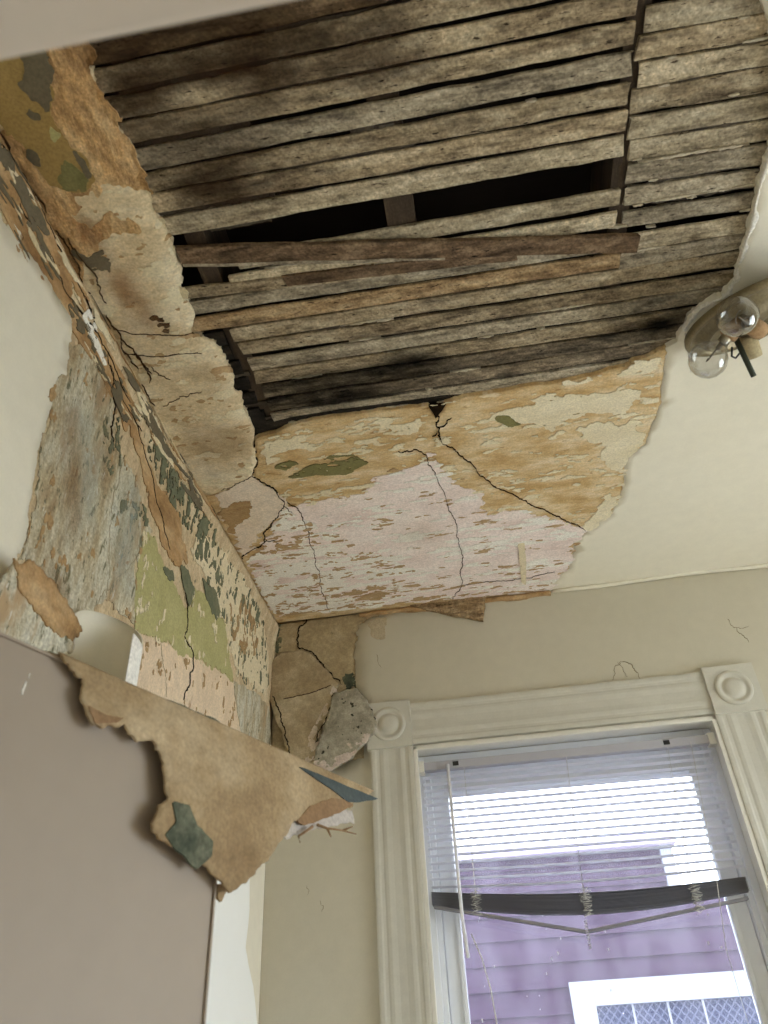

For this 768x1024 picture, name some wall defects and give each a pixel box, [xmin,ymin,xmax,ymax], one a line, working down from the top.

flaking render [682,148,768,336]
crack [0,132,202,603]
flaking render [0,42,667,753]
crack [161,593,194,700]
crack [223,441,341,753]
crack [398,412,583,597]
peeling [284,809,354,840]